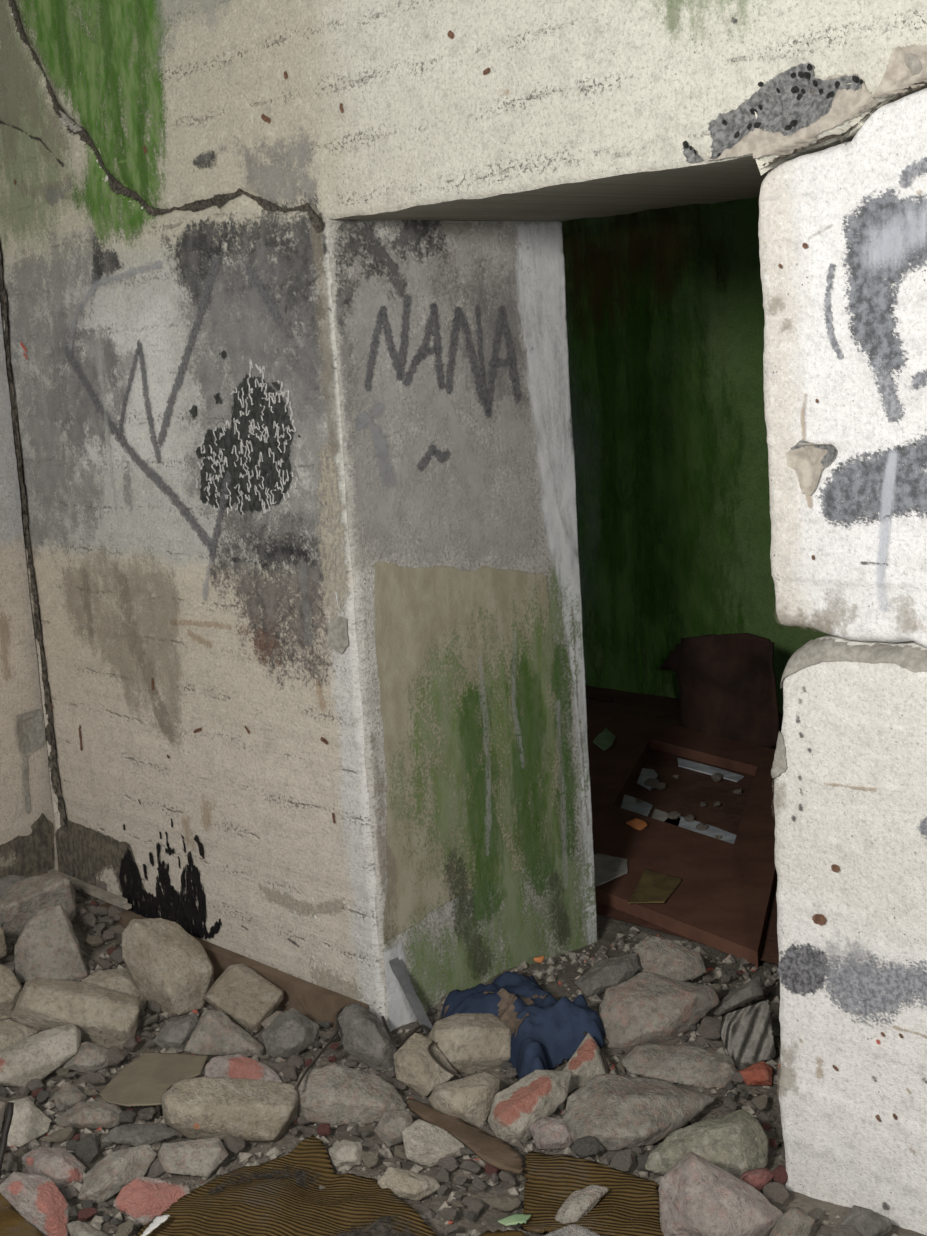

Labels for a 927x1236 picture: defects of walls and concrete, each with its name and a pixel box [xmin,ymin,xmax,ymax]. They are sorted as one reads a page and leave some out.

crack [0,0,323,232]
spalling [683,44,927,163]
spalling [786,394,836,507]
crack [0,242,67,831]
damp [445,852,492,979]
damp [550,873,570,944]